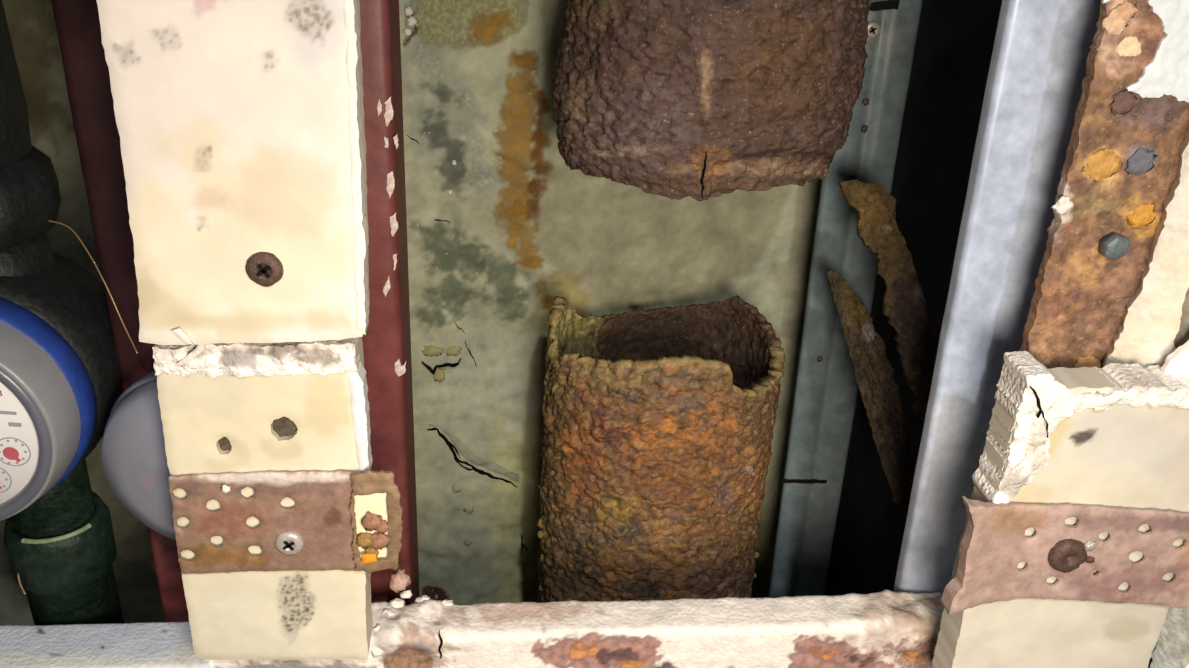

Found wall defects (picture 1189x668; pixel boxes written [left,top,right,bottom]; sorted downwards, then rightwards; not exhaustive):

rust [474,13,508,42]
rust [494,54,551,269]
spalling [152,328,360,379]
rust [825,179,940,510]
crack [427,424,520,487]
spalling [972,351,1189,504]
rust [532,633,675,668]
rust [789,635,936,668]